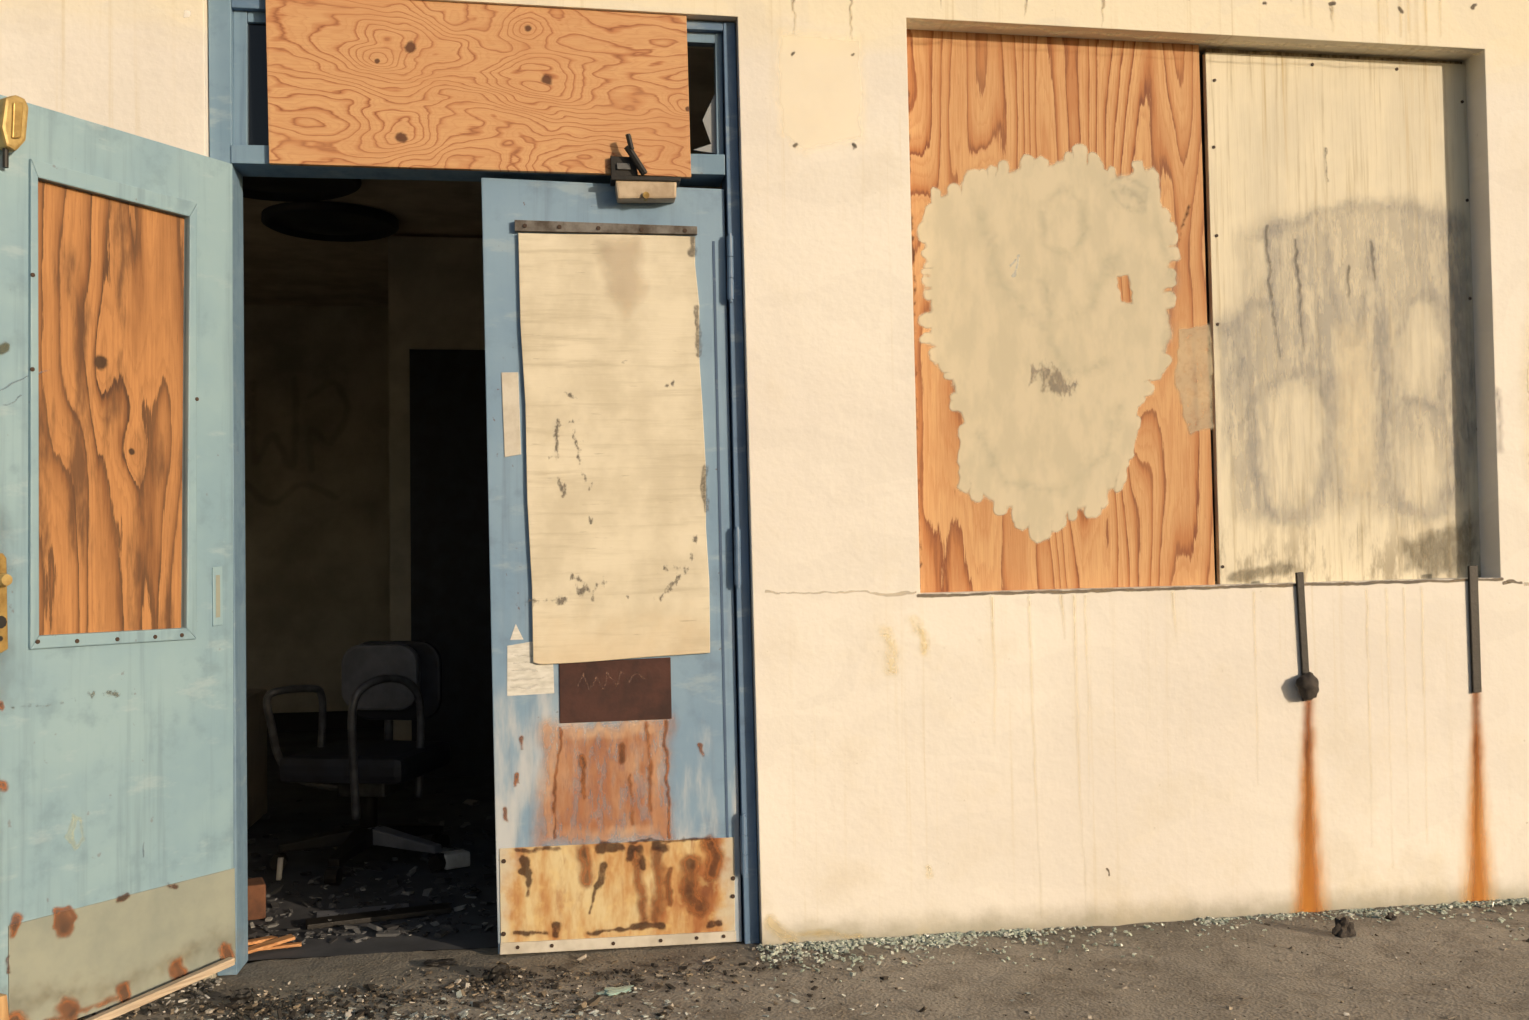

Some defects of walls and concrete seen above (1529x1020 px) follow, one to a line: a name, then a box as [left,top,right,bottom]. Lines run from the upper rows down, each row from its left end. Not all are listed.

corrosion [1301,700,1321,912]
corrosion [1468,693,1487,902]
corrosion [515,720,723,935]
corrosion [10,913,22,937]
corrosion [53,906,77,937]
corrosion [513,922,560,938]
corrosion [220,943,234,959]
corrosion [170,958,187,980]
corrosion [49,982,130,1020]